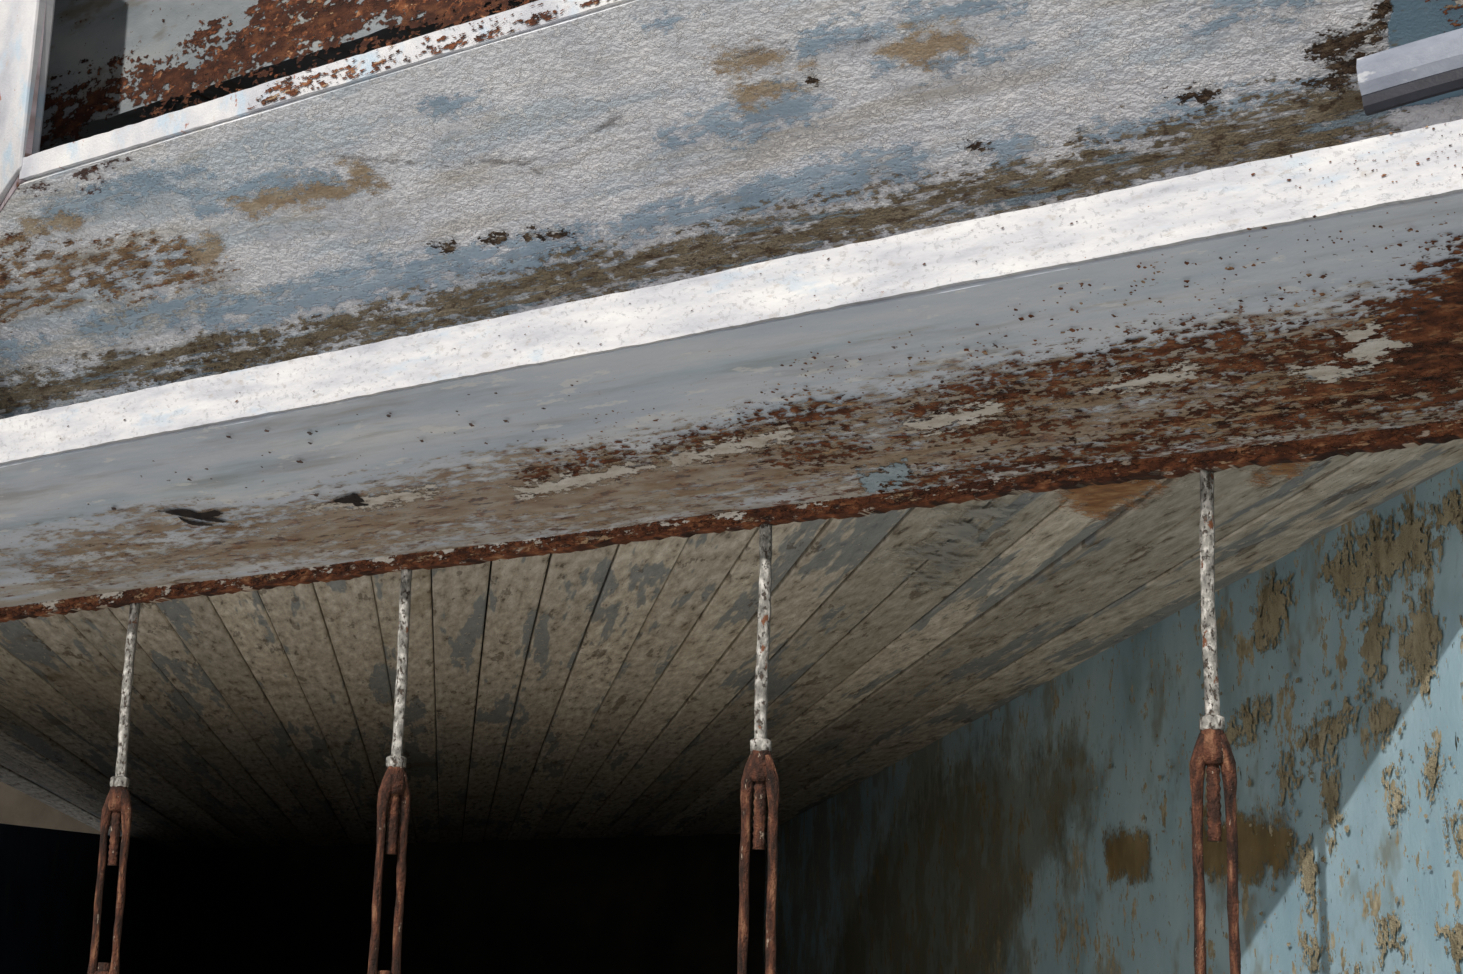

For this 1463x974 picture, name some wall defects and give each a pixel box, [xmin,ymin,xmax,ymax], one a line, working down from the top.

rust [0,157,240,333]
rust [40,0,609,150]
rust [0,202,1463,618]
peeling [31,0,1463,386]
rust [1425,0,1463,26]
peeling [1224,479,1463,974]